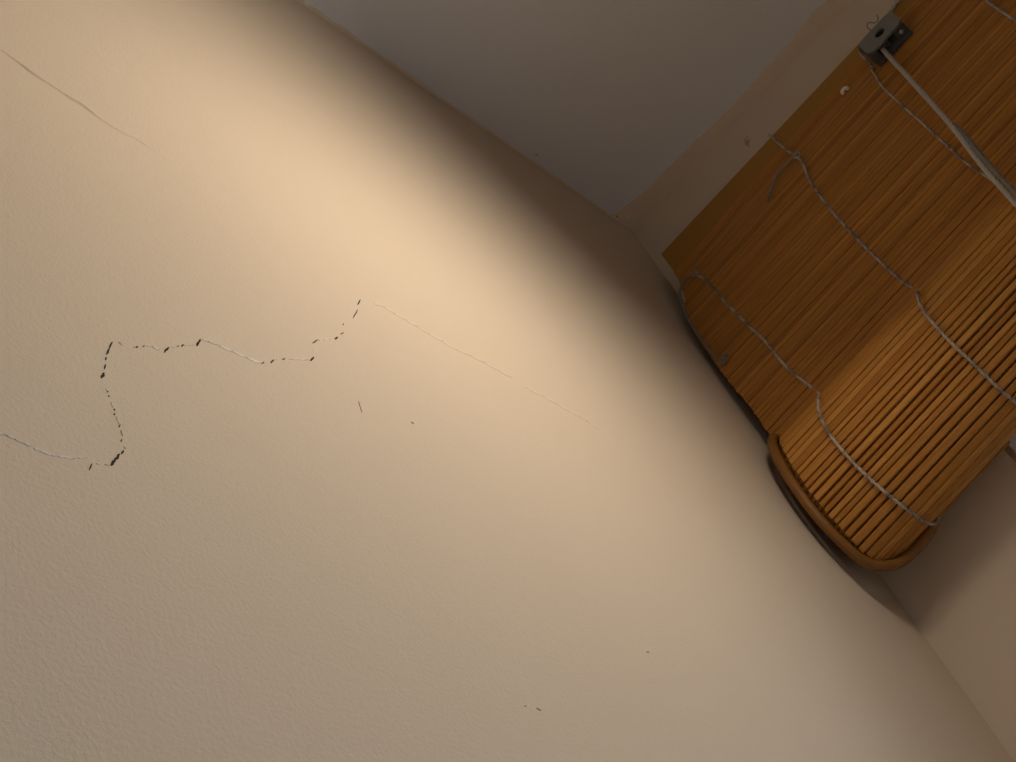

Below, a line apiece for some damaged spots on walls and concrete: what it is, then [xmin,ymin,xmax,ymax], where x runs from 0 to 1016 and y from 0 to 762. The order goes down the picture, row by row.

crack [0,299,597,470]